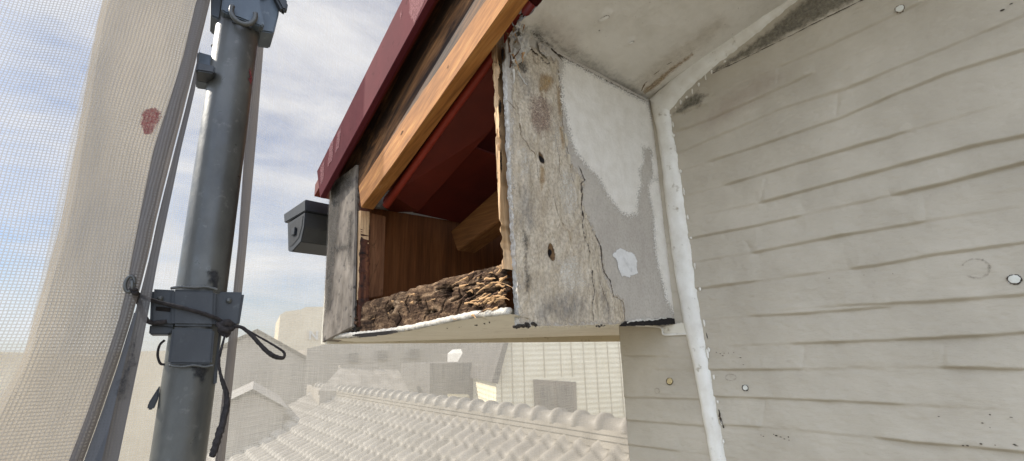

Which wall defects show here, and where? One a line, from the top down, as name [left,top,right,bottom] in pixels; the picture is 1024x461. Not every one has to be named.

crack [507,48,675,326]
peeling [509,10,674,329]